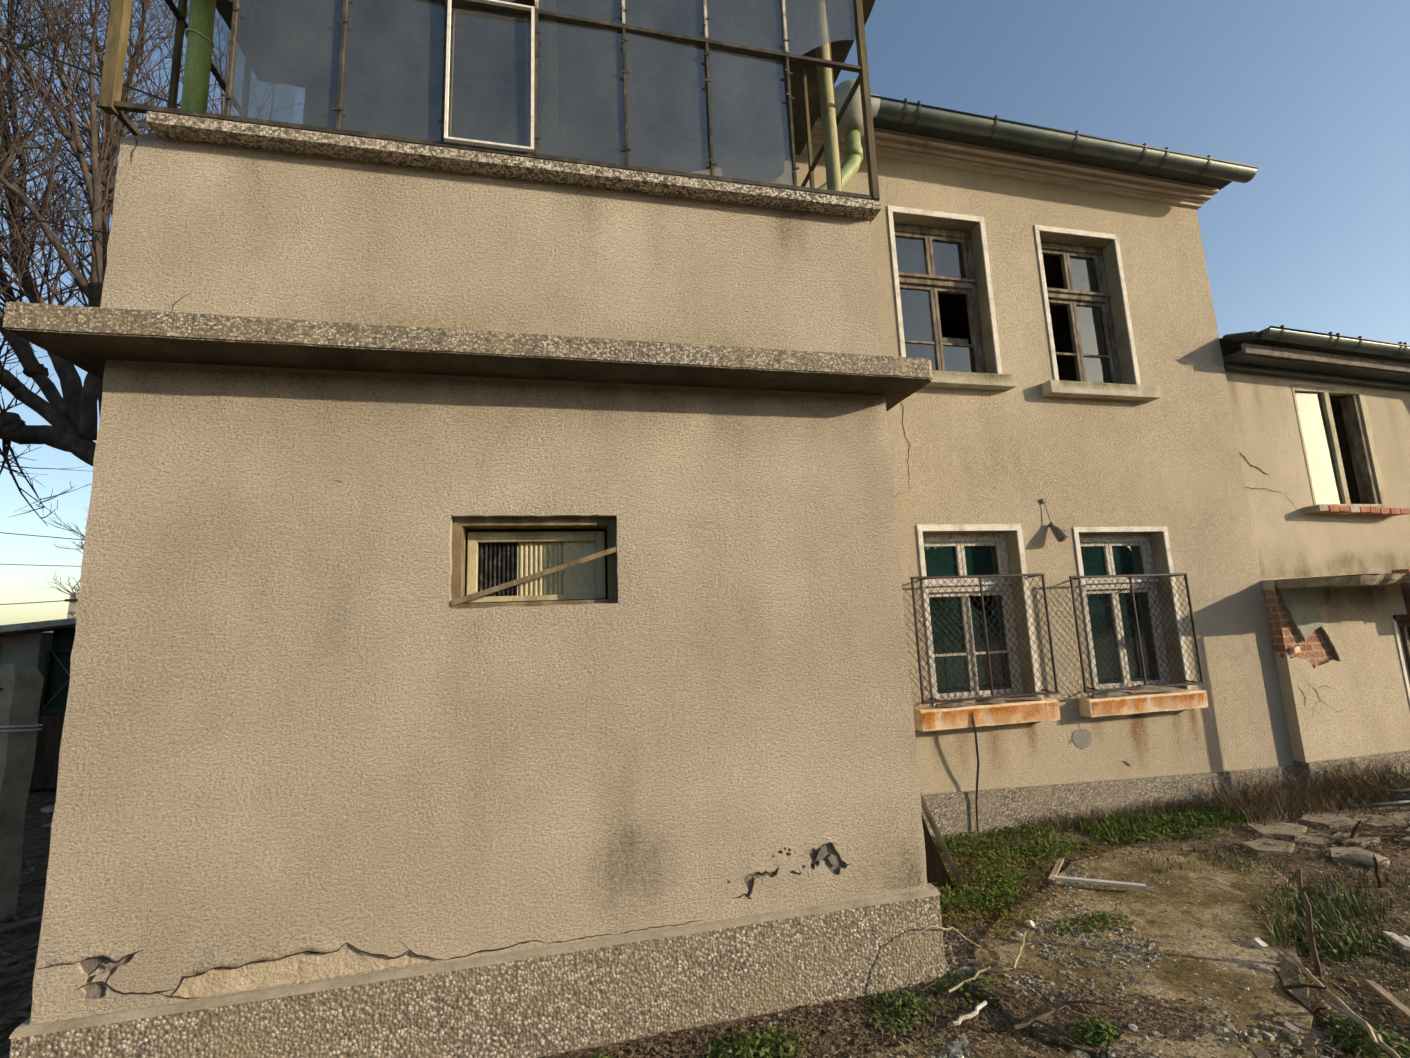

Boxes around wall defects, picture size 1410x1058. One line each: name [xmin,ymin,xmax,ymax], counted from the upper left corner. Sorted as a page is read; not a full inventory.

crack [895,403,910,497]
crack [1239,452,1297,510]
flaking render [1263,587,1341,665]
rust [925,703,1059,733]
rust [1095,693,1206,742]
flaking render [727,843,849,899]
crack [445,920,702,960]
flaking render [38,940,443,999]